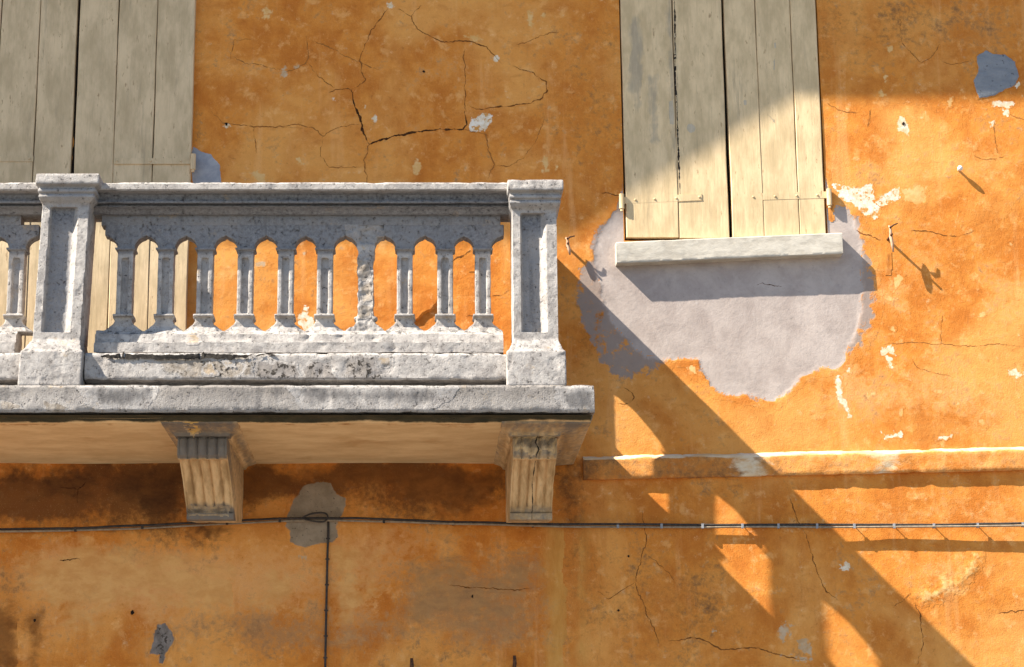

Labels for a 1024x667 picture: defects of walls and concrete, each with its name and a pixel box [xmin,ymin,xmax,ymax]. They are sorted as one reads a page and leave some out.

flaking render [191,146,222,183]
crack [211,7,557,183]
flaking render [566,174,930,420]
damp [0,463,603,667]
crack [600,513,800,660]
crack [790,499,836,598]